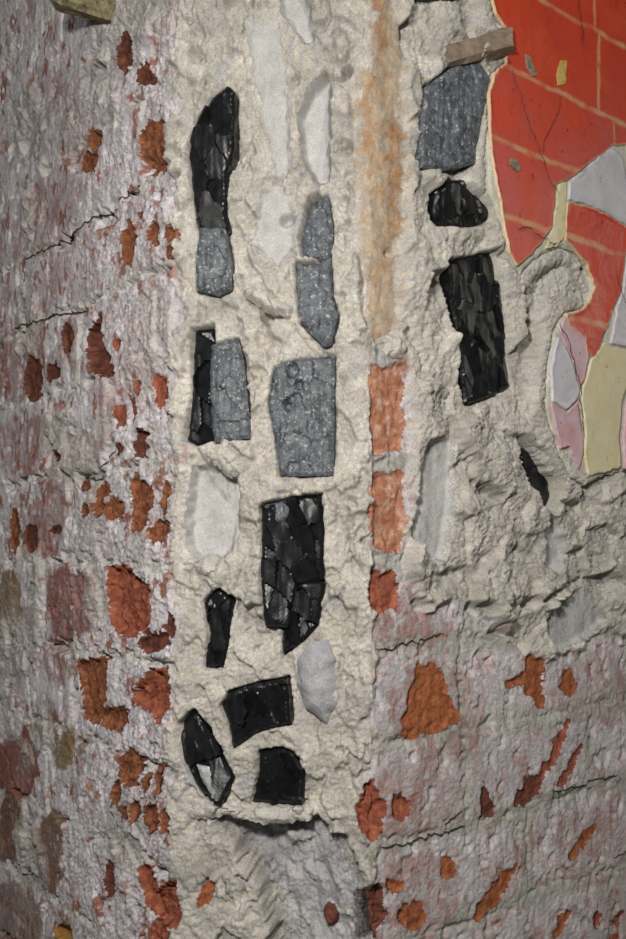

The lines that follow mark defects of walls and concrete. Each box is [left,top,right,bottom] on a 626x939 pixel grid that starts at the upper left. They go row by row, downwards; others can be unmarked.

corrosion [351,0,410,341]
crack [22,185,140,261]
spalling [85,311,121,379]
spalling [105,563,176,654]
crack [376,633,445,651]
spalling [399,661,460,740]
spalling [504,653,546,709]
spalling [355,778,411,842]
crack [380,811,465,849]
spalling [479,781,497,819]
spalling [513,718,583,808]
crack [554,775,618,793]